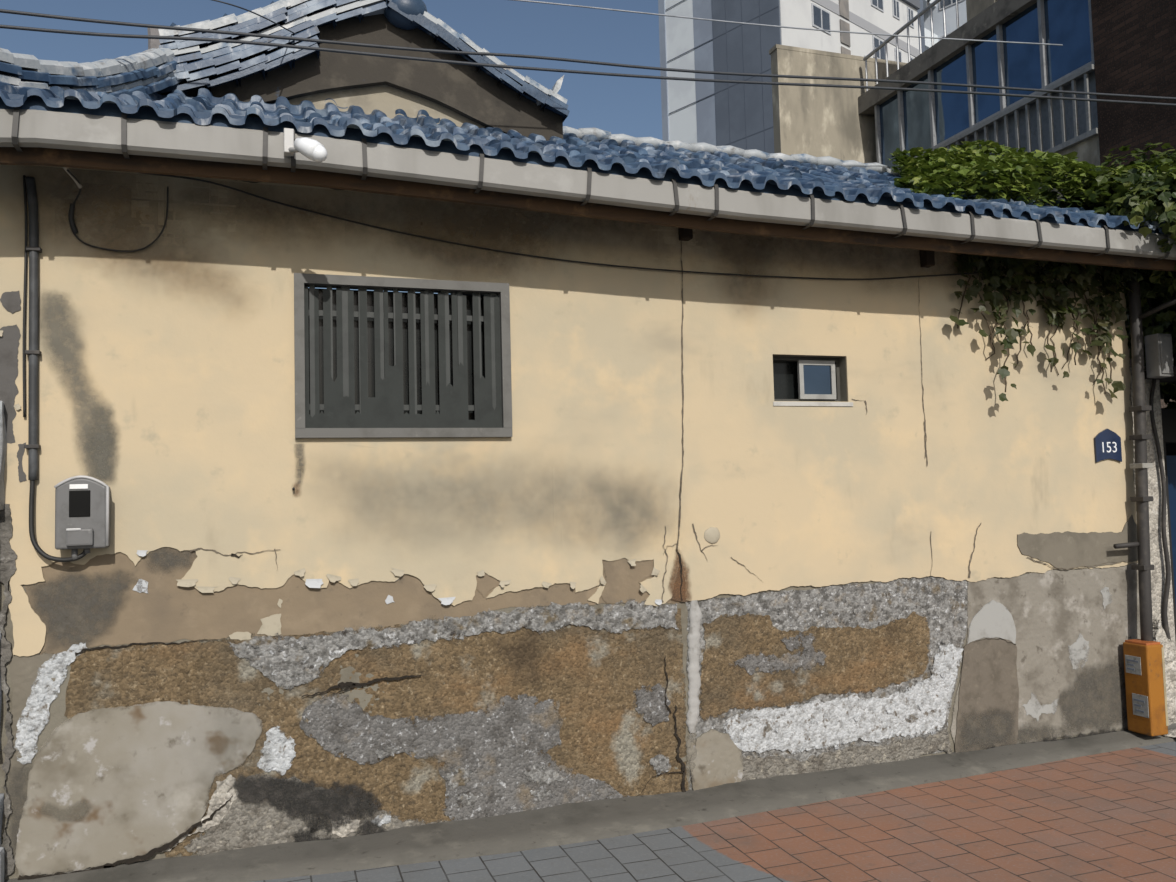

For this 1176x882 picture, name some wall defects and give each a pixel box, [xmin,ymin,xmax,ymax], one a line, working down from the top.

peeling [0,291,26,482]
damp [43,295,113,479]
crack [190,548,280,568]
damp [296,444,304,494]
crack [662,244,684,603]
corrosion [670,555,690,602]
flaking render [7,547,1141,870]